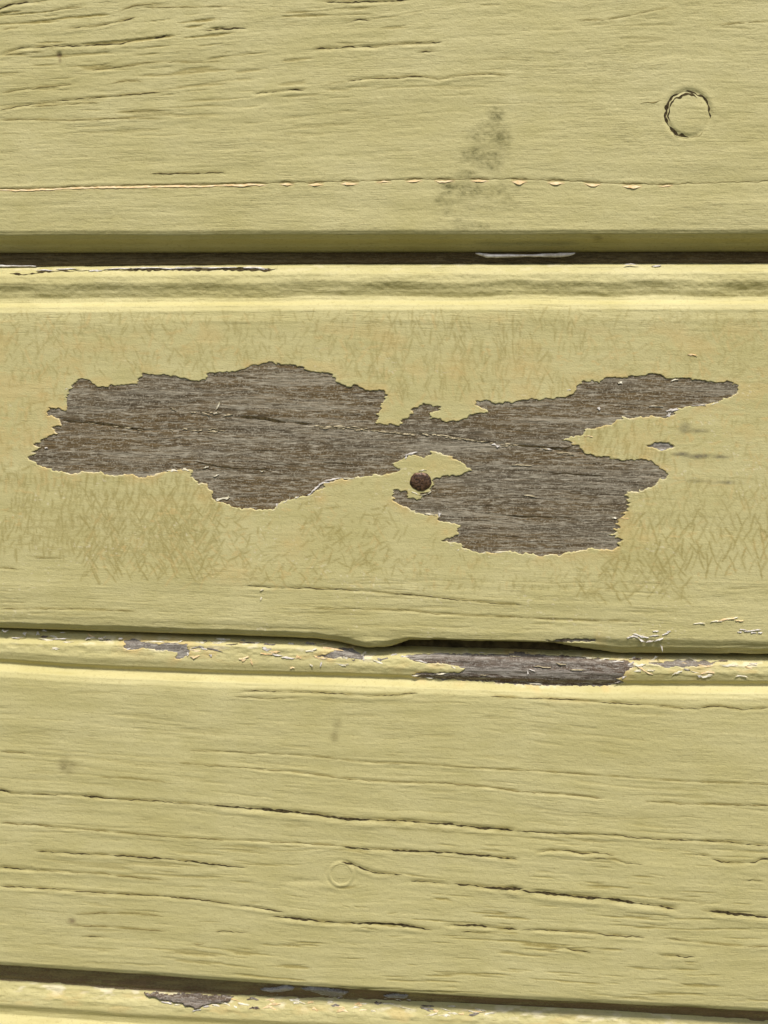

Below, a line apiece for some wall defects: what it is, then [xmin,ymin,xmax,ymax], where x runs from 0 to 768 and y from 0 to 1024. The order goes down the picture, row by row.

crack [643,90,711,139]
crack [0,172,768,191]
peeling [28,362,738,557]
peeling [2,629,757,687]
crack [0,777,768,956]
peeling [144,985,494,1017]